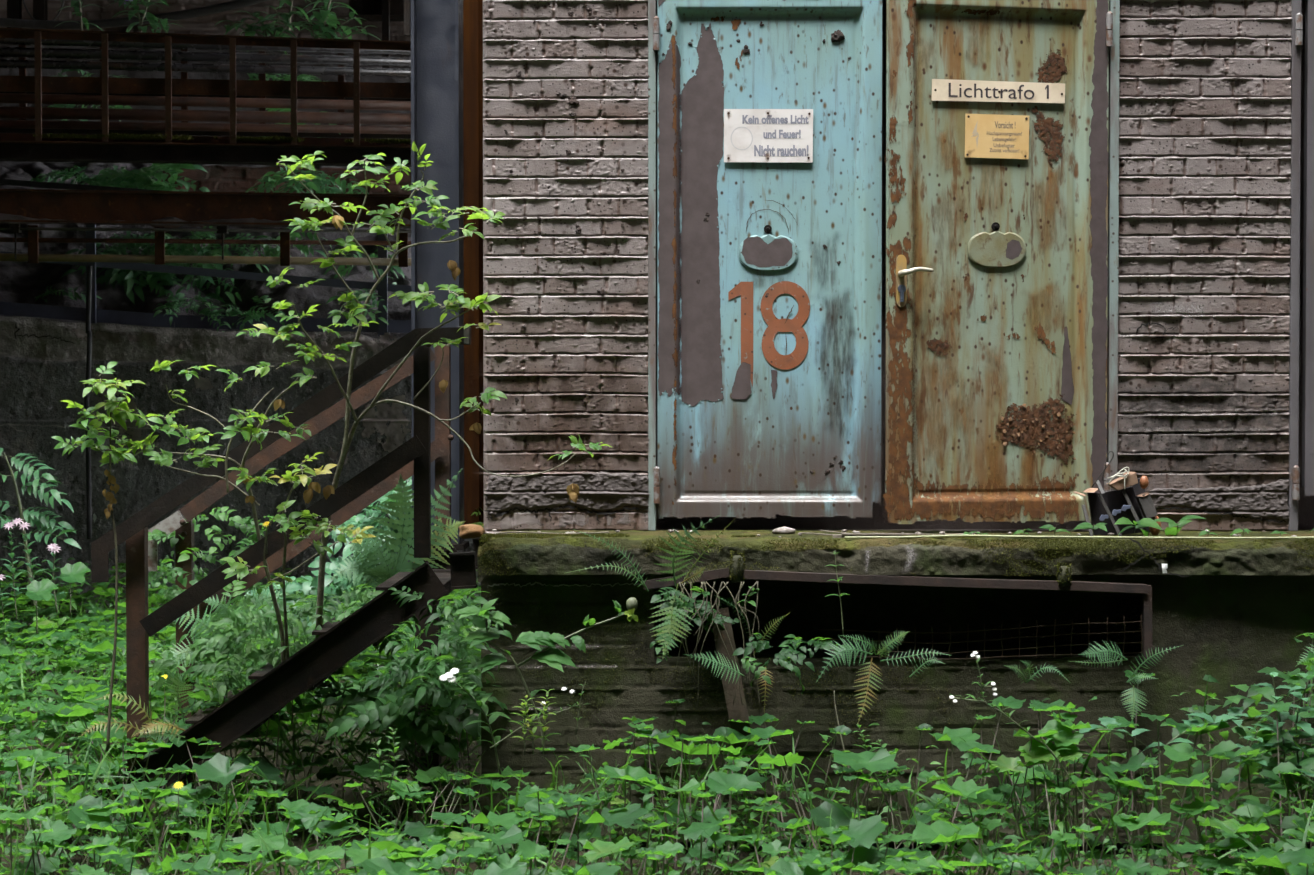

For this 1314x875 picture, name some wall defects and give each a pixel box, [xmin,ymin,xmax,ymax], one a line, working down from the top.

peeling [658,22,752,407]
corrosion [882,0,1081,525]